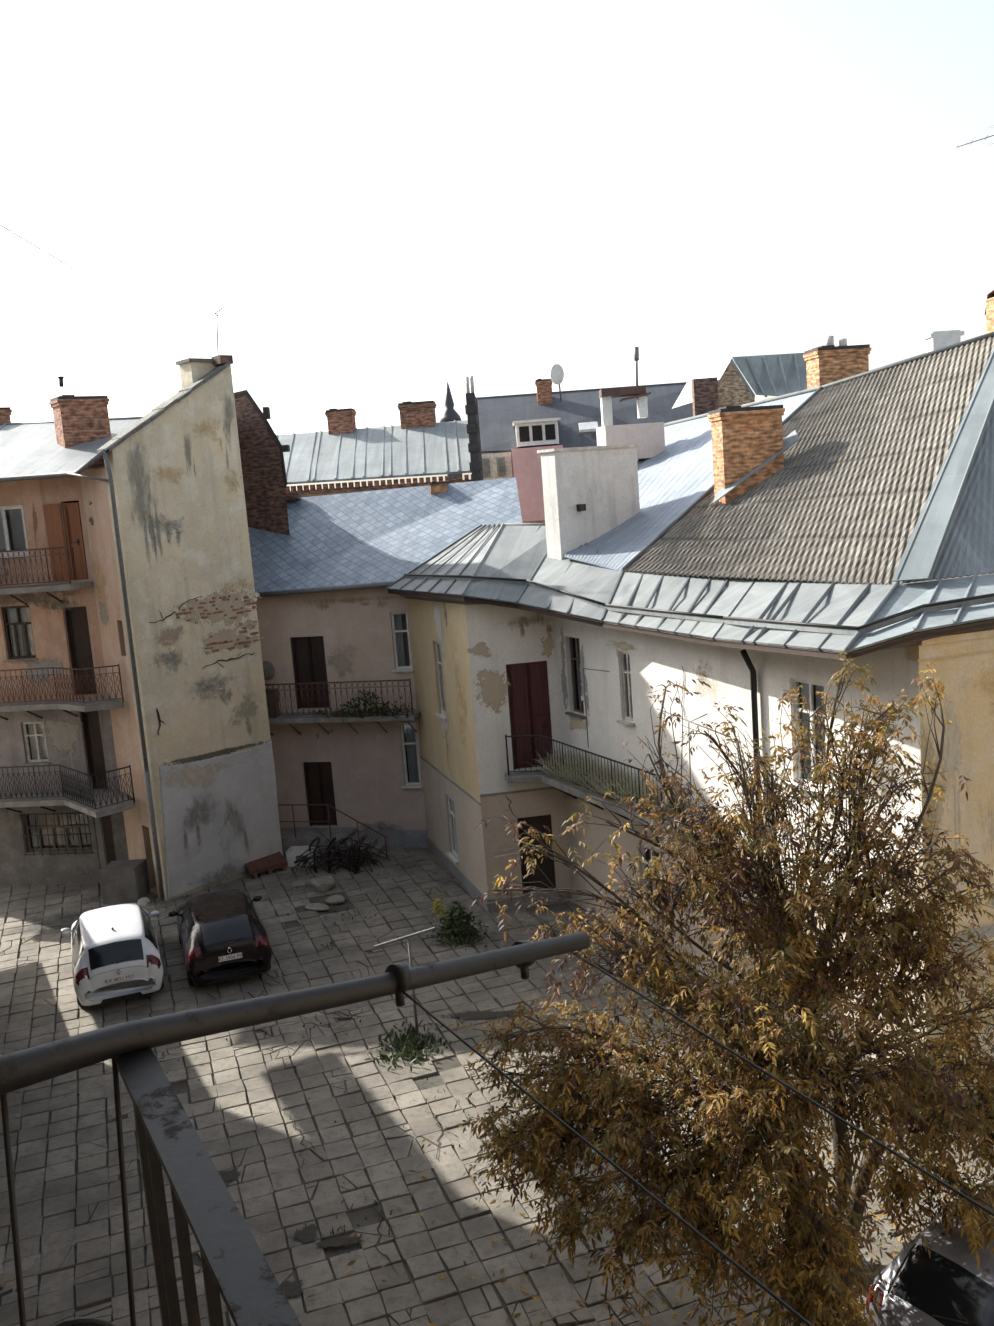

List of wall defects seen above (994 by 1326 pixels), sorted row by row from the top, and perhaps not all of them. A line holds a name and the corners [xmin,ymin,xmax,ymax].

damp [160,439,195,478]
damp [131,446,180,551]
flaking render [167,589,264,655]
flaking render [467,642,509,713]